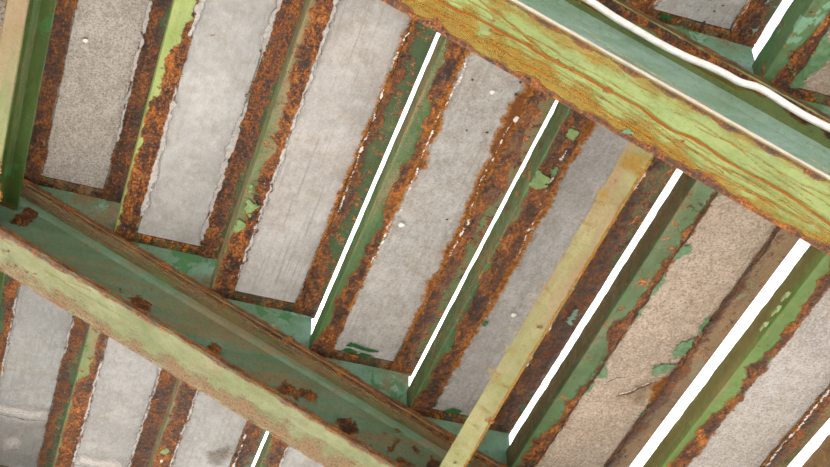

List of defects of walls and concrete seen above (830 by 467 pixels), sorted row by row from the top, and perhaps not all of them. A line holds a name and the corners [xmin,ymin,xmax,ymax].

corrosion [101,0,173,203]
corrosion [0,200,454,467]
corrosion [197,0,305,259]
corrosion [516,378,595,467]
corrosion [400,0,830,226]
crack [537,192,780,467]
corrosion [749,200,830,245]
peeling [789,19,830,89]